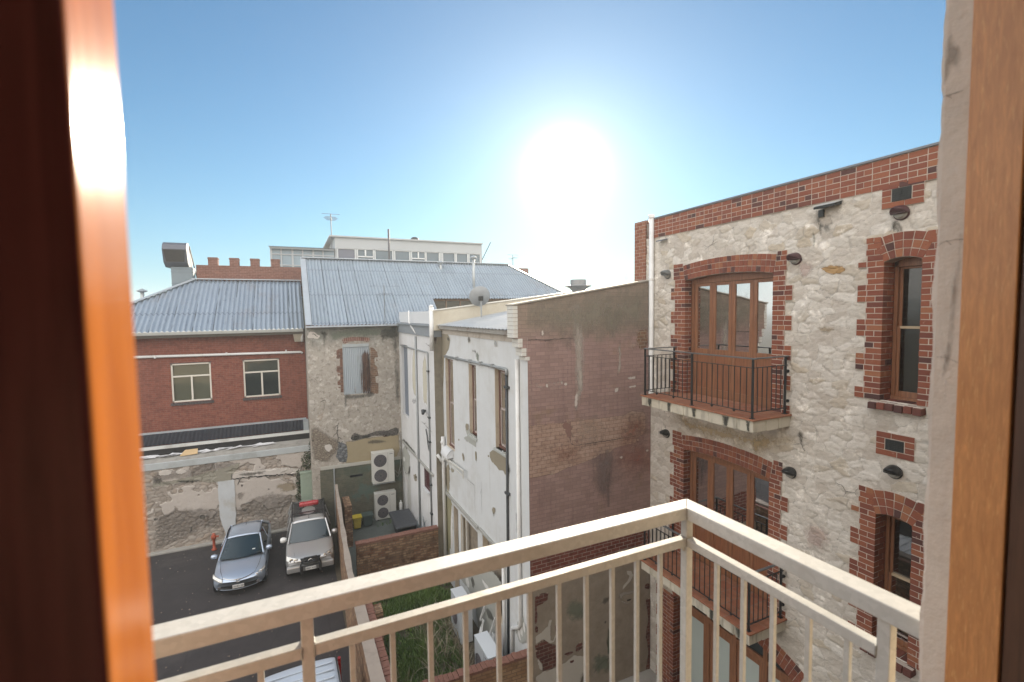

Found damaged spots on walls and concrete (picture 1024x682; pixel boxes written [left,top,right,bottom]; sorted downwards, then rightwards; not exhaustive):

spalling [311,428,399,462]
spalling [154,469,186,483]